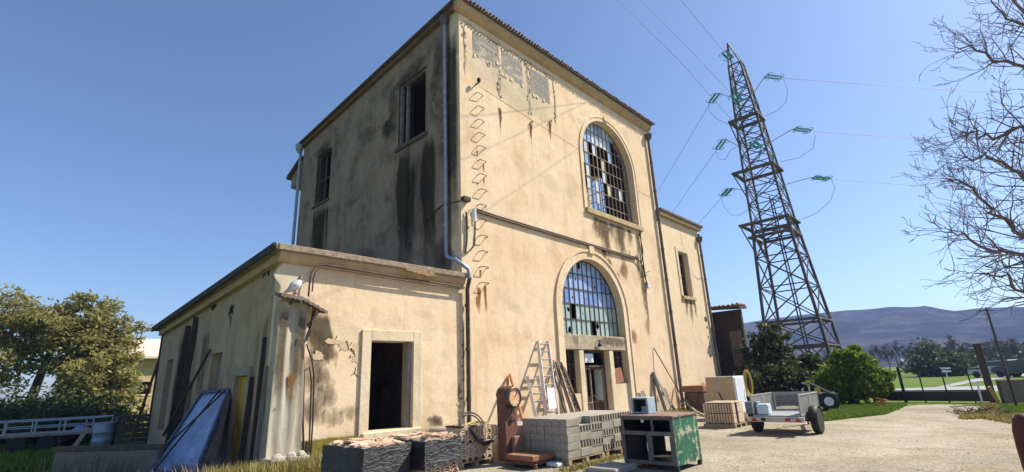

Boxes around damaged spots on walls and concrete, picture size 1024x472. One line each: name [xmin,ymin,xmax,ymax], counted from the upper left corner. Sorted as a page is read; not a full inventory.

leakage [313,210,328,250]
leakage [396,140,435,246]
leakage [276,311,333,418]
flaking render [312,338,361,363]